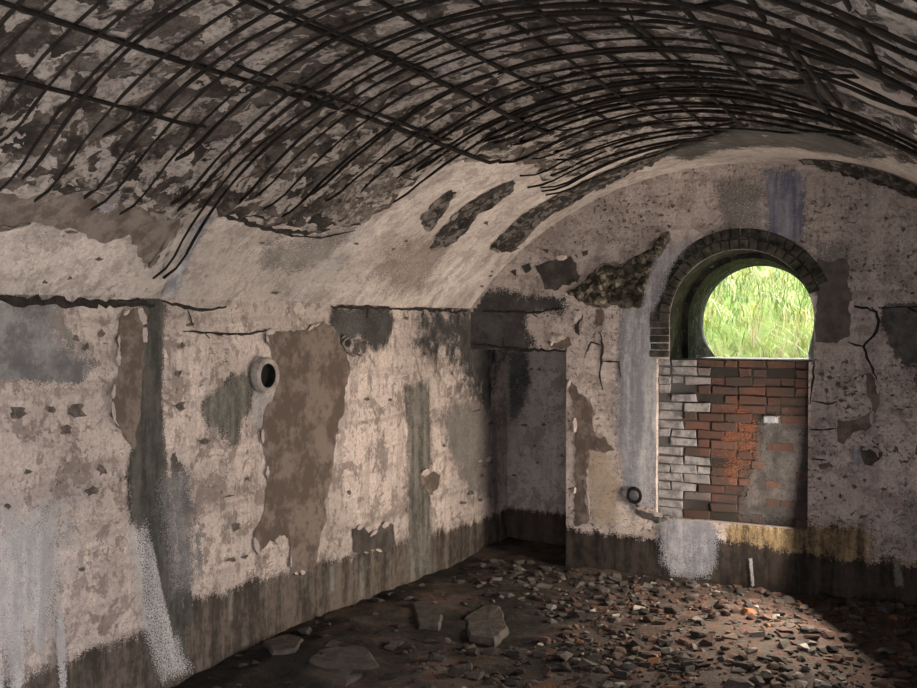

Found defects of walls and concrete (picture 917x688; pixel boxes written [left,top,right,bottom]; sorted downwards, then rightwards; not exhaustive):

spalling [0,0,917,279]
crack [0,294,267,339]
spalling [510,204,675,349]
crack [850,305,917,379]
flaking render [226,321,367,575]
water stain [0,214,917,688]
flaking render [565,379,615,526]